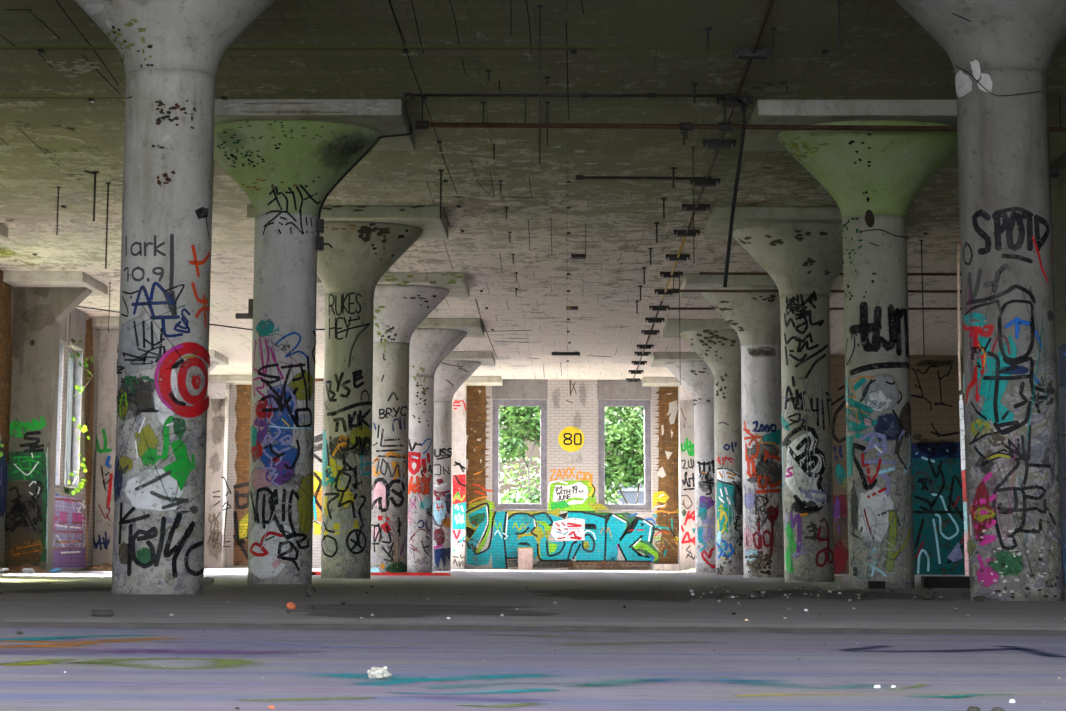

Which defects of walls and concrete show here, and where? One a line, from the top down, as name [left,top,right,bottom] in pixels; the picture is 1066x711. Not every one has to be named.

peeling [955,60,992,97]
flaking render [466,342,552,509]
flaking render [654,387,678,564]